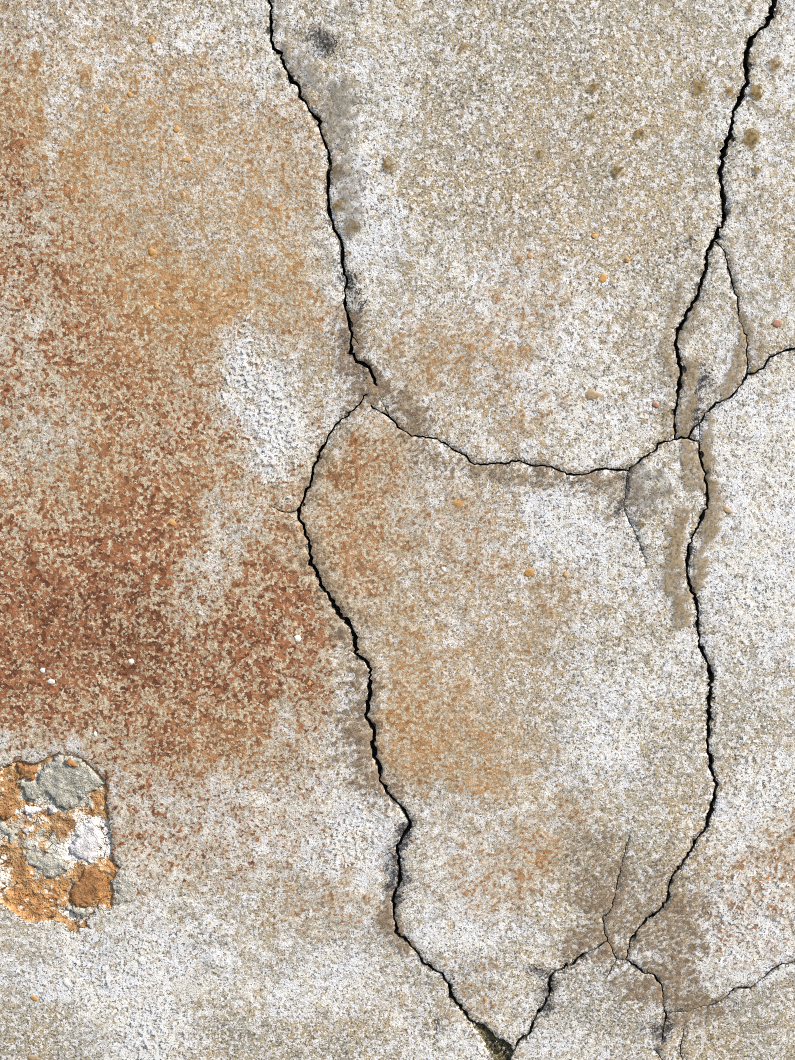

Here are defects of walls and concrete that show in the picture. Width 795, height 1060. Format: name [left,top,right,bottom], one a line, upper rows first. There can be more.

spalling [0,752,134,932]
rust [0,0,611,1041]
crack [266,0,795,1060]